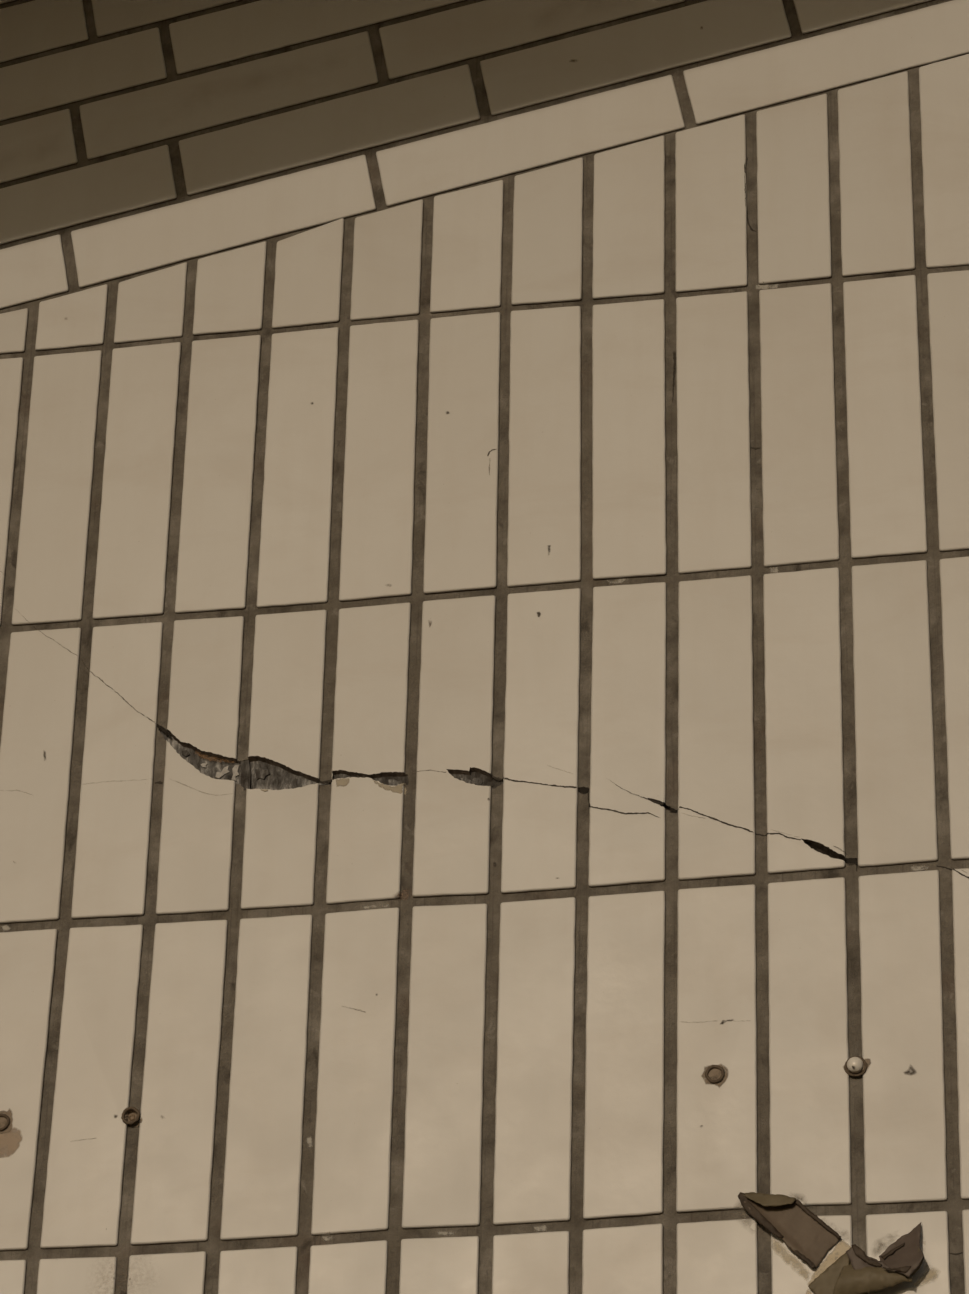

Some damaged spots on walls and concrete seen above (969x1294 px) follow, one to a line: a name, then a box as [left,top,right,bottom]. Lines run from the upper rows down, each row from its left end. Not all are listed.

crack [33,626,170,736]
spalling [159,729,409,795]
spalling [451,772,503,789]
crack [489,773,801,840]
crack [834,846,858,872]